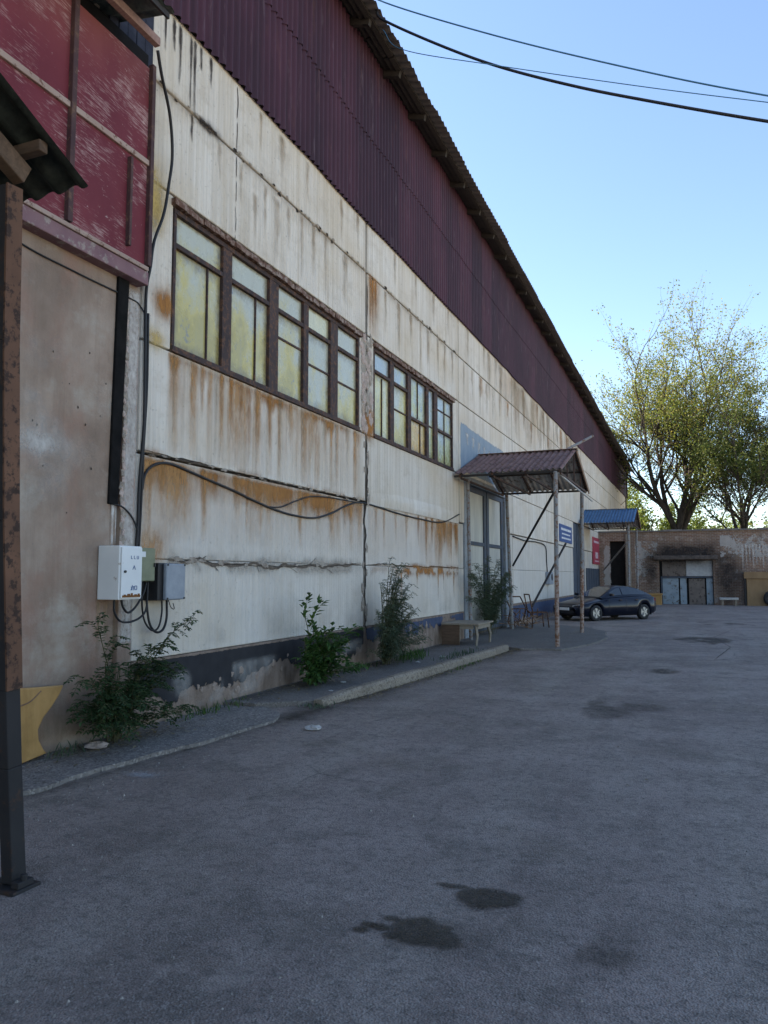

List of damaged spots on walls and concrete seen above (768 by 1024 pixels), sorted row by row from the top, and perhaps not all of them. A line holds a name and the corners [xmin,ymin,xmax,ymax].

water stain [165,18,218,136]
corrosion [157,292,171,318]
corrosion [191,366,292,436]
corrosion [303,410,373,462]
corrosion [144,458,361,525]
crack [169,440,459,630]
corrosion [418,516,458,550]
corrosion [401,565,454,584]
peeling [399,613,464,642]
peeling [134,627,382,706]
water stain [440,883,522,908]
water stain [390,917,461,948]